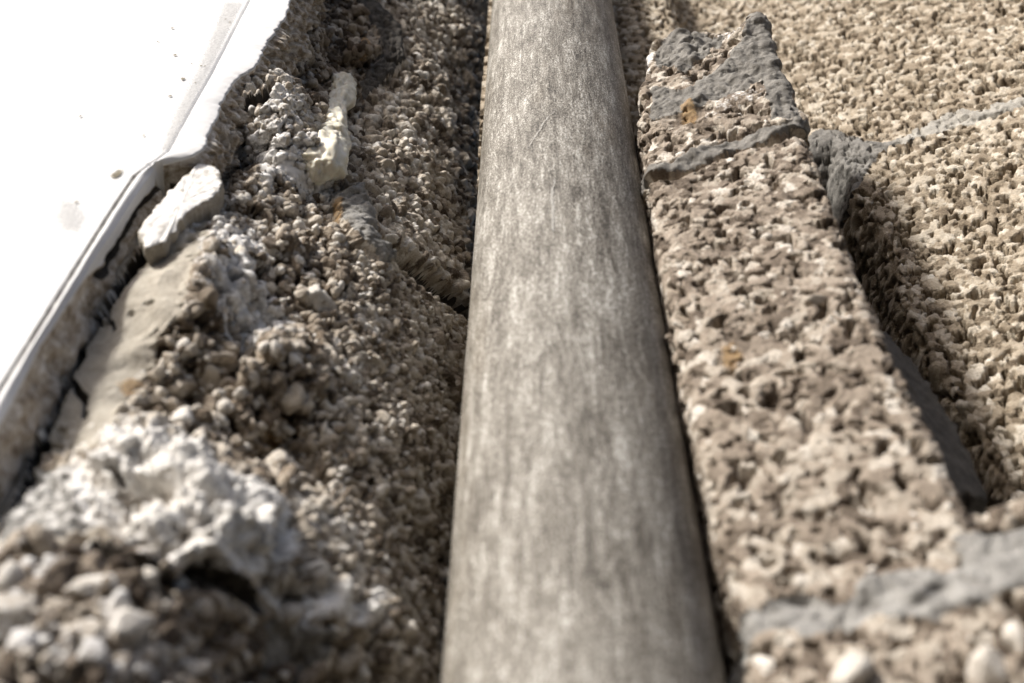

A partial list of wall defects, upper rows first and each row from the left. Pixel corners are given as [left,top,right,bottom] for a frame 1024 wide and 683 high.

spalling [300,0,382,123]
rust [680,98,697,125]
spalling [129,162,353,511]